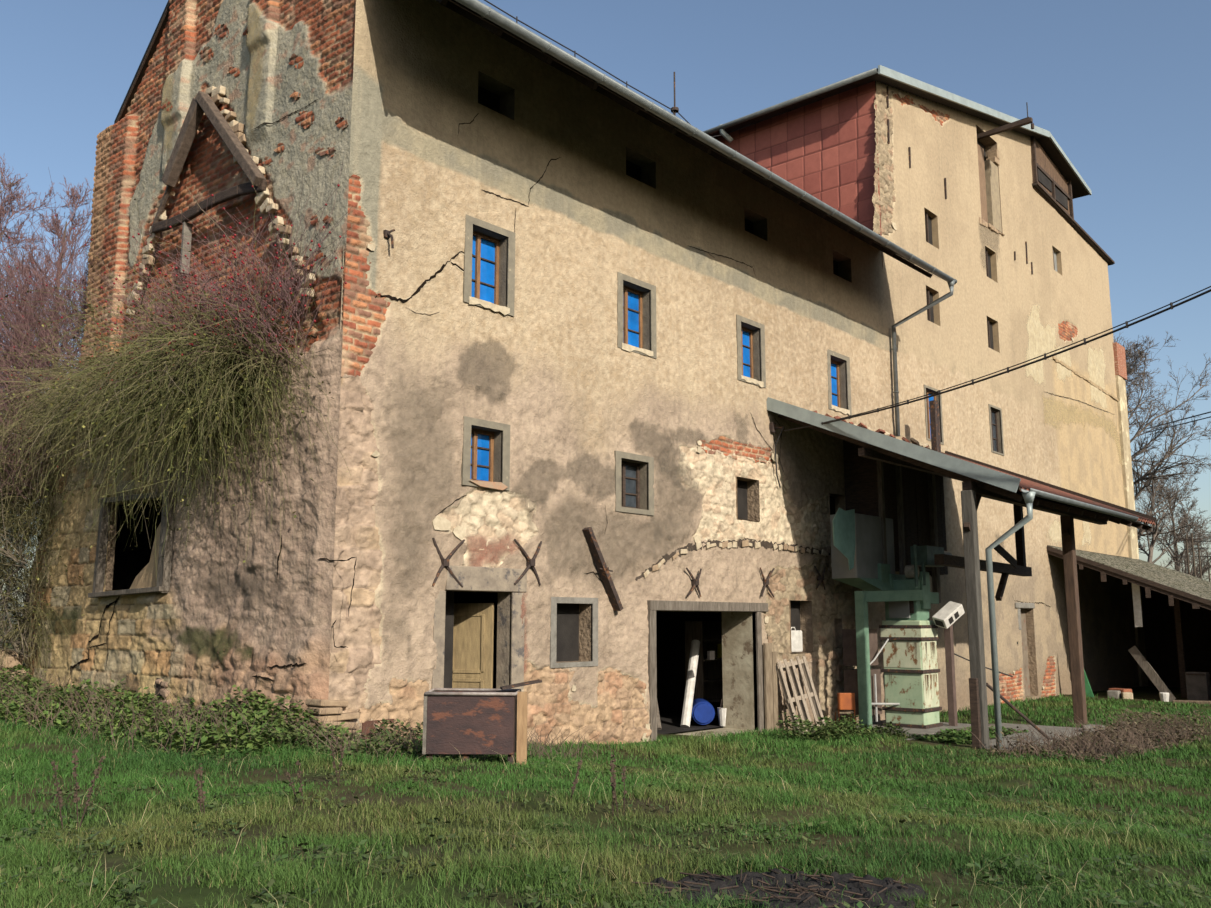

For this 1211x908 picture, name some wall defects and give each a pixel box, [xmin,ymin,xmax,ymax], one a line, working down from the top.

spalling [199,24,248,63]
spalling [126,168,183,315]
spalling [194,67,326,297]
crack [252,98,320,130]
crack [375,251,473,315]
crack [483,157,561,233]
spalling [872,90,951,236]
peeling [1026,305,1078,384]
spalling [432,488,539,568]
spalling [635,436,862,724]
crack [66,589,122,688]
spalling [520,602,652,746]